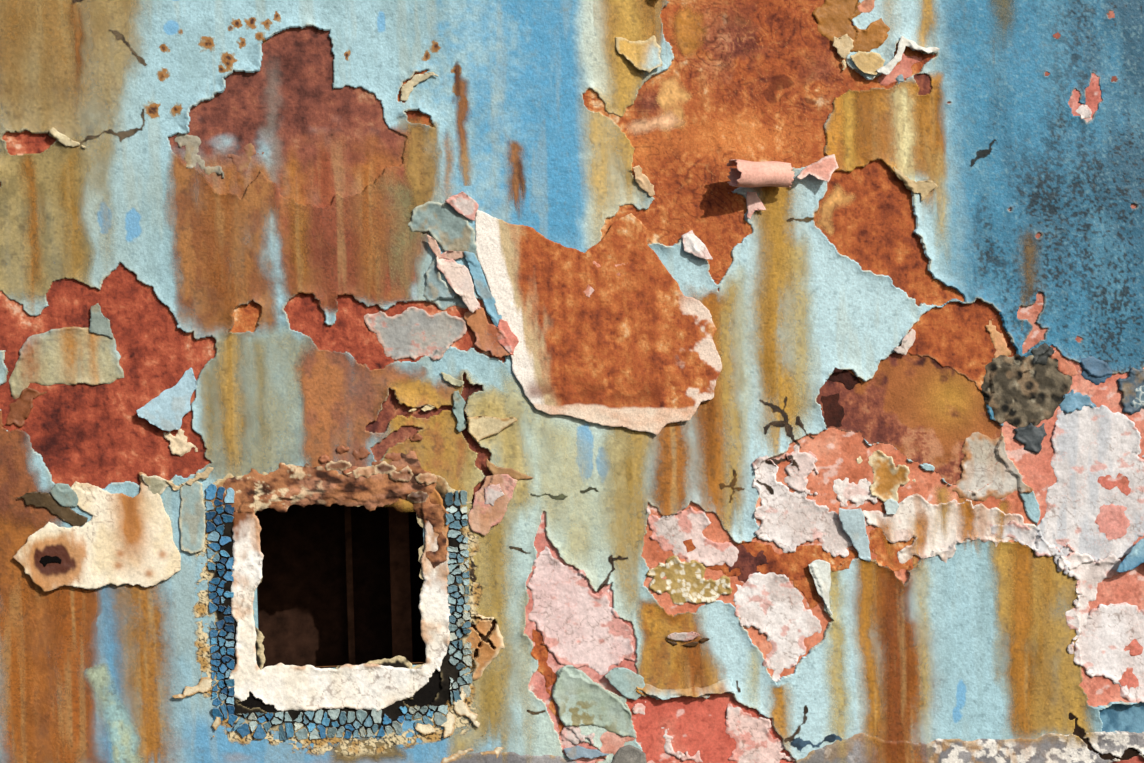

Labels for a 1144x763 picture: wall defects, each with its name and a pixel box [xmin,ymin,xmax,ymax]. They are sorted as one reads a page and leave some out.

crack [80,109,145,144]
crack [109,29,147,66]
peeling [397,70,478,310]
corrosion [0,0,529,763]
crack [719,396,814,503]
corrosion [583,0,1016,697]
peeling [641,292,1144,733]
peeling [524,511,795,763]
corrosion [830,570,846,737]
corrosion [858,559,929,763]
corrosion [992,541,1091,741]
peeling [1112,755,1144,763]